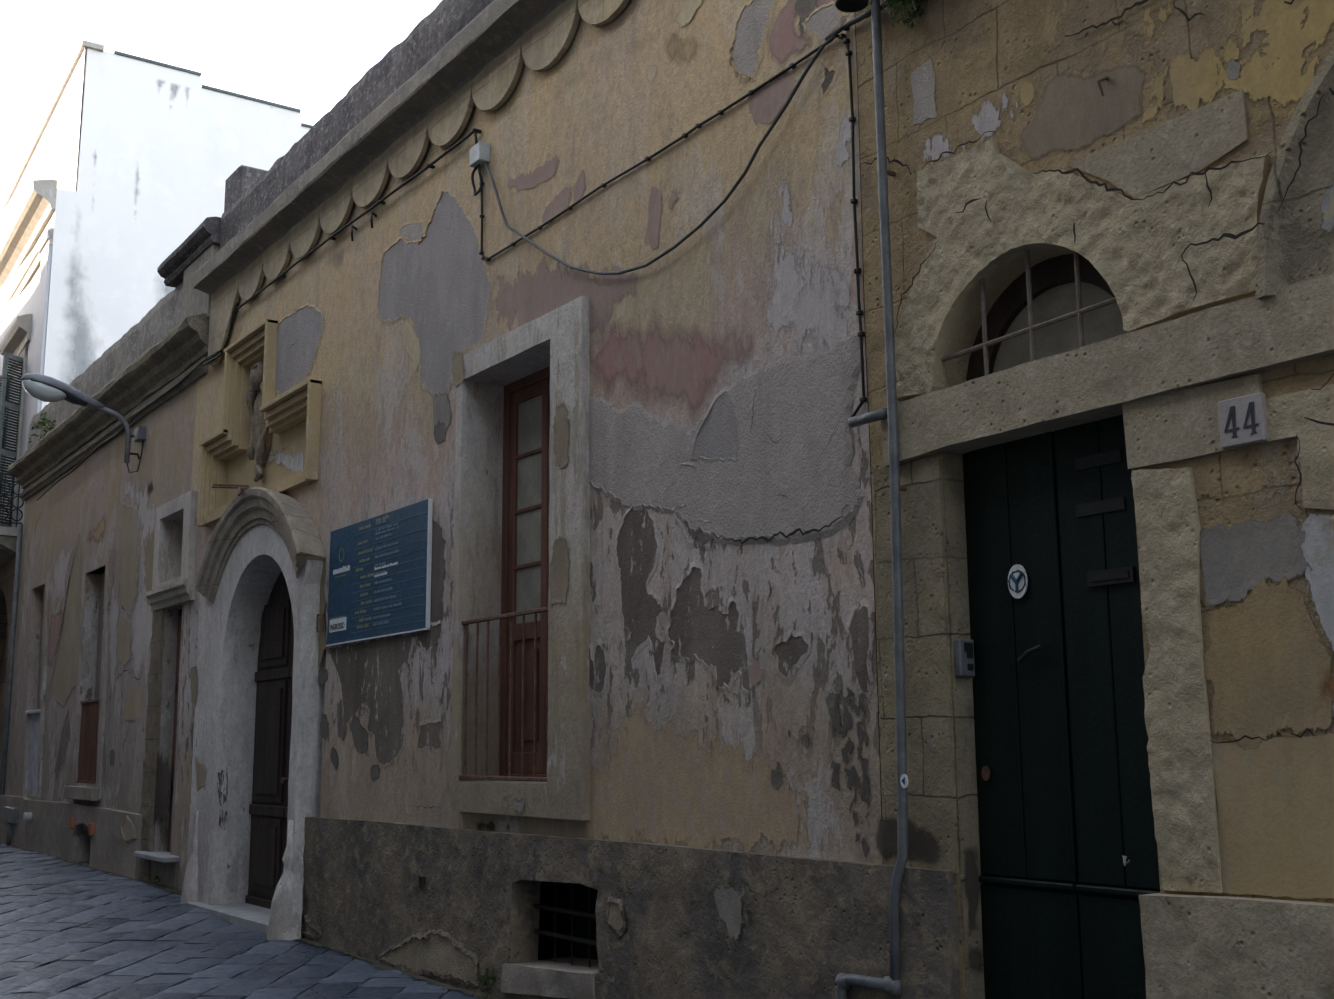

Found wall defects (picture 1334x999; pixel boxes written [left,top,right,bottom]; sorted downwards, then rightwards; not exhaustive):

flaking render [729,0,848,124]
crack [1065,0,1205,37]
flaking render [912,80,1038,174]
peeling [508,155,558,192]
peeling [542,170,585,223]
peeling [645,187,678,249]
leakage [69,311,90,384]
flaking render [275,303,325,395]
flaking render [377,188,492,444]
flaking render [679,386,740,484]
flaking render [826,688,871,857]